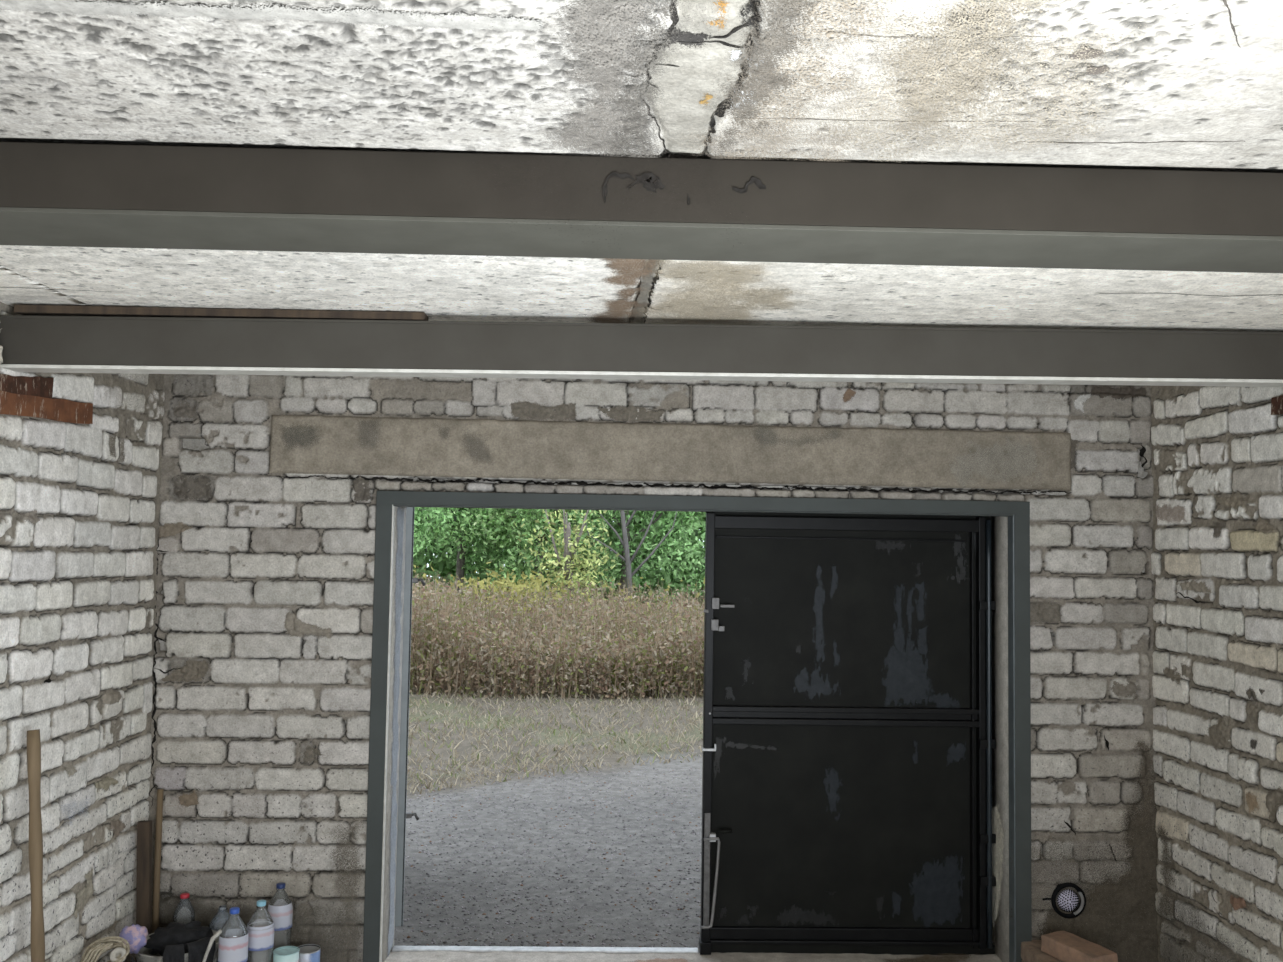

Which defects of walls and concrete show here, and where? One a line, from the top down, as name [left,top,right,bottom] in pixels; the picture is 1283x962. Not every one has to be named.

crack [629,0,855,153]
water stain [512,0,1185,163]
crack [2,285,102,293]
water stain [583,258,841,325]